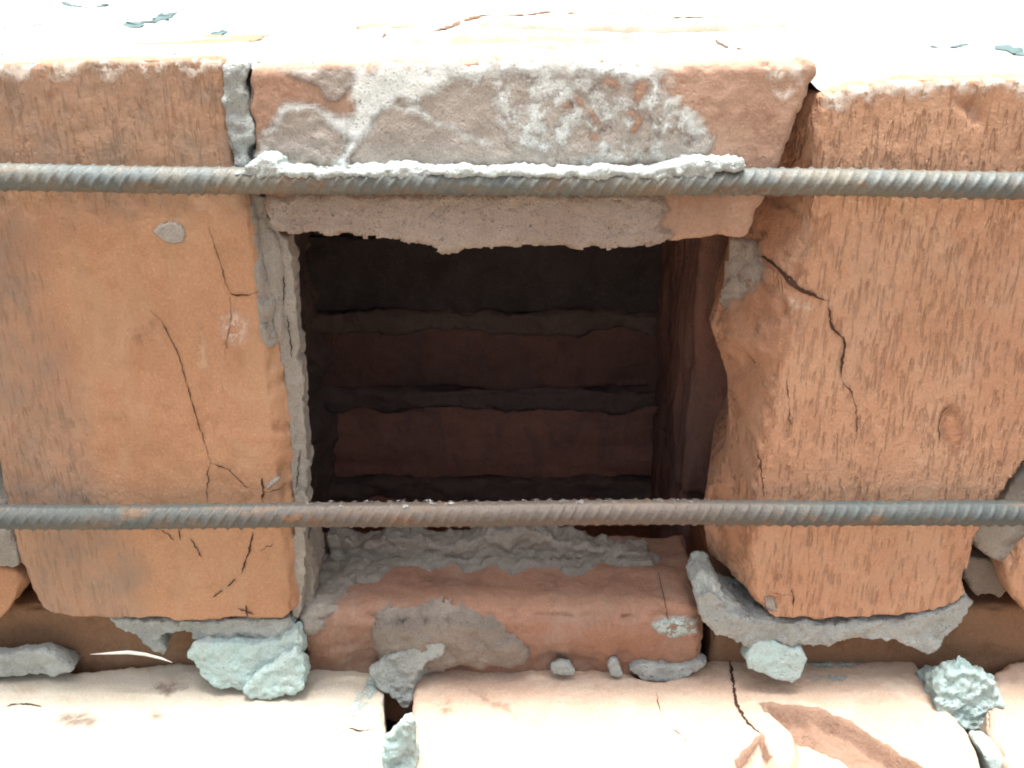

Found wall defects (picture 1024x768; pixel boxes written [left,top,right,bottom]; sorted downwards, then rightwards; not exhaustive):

damp [279,56,705,166]
spalling [263,194,674,255]
crack [209,230,257,349]
crack [283,276,293,357]
crack [757,255,858,433]
crack [151,311,300,502]
crack [213,532,272,616]
crack [729,661,765,735]